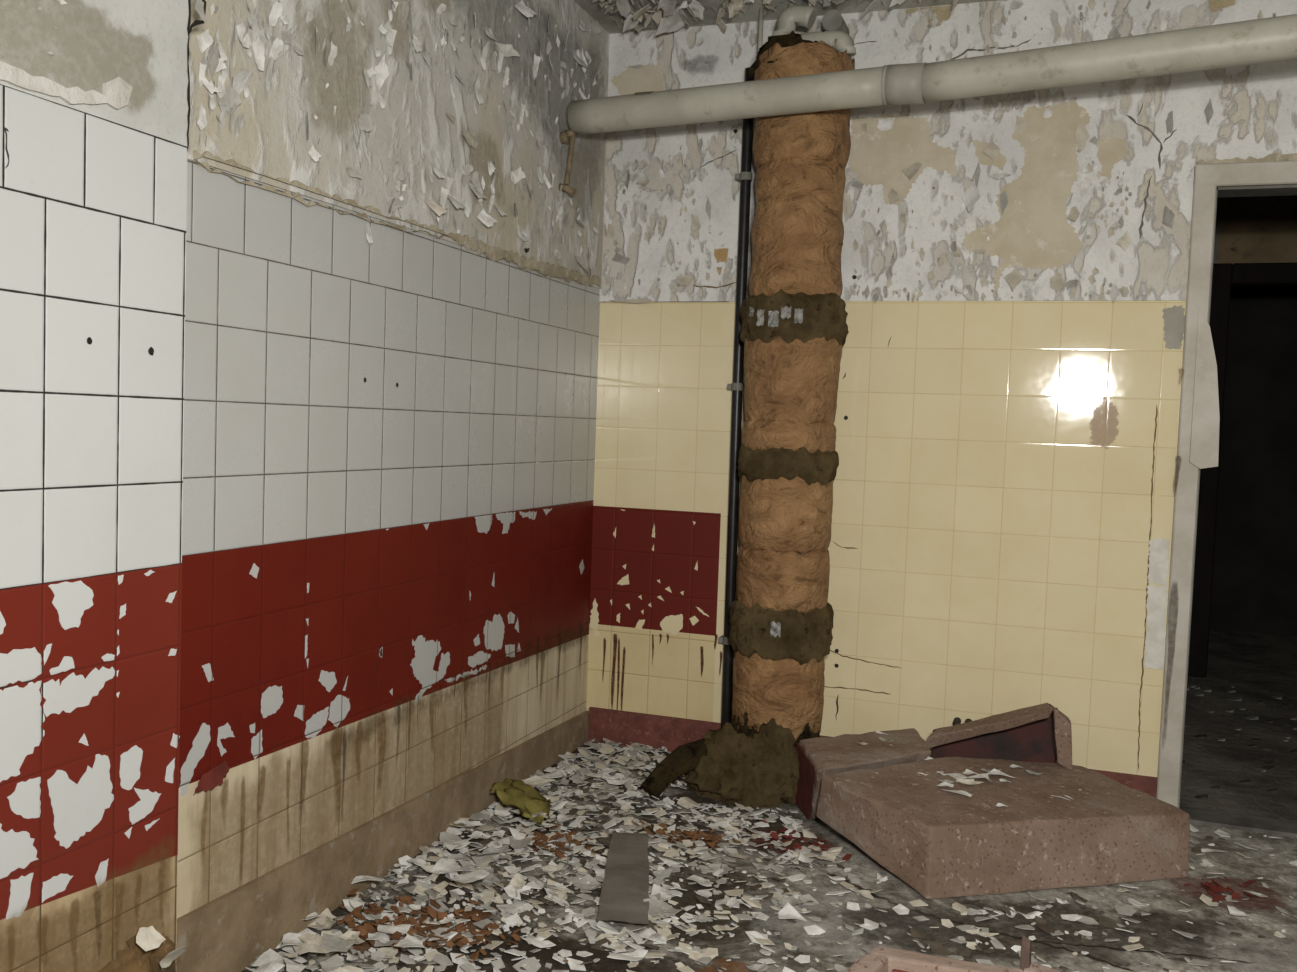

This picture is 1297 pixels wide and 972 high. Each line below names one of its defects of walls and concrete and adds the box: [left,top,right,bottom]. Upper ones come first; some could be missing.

spalling [0,61,133,109]
spalling [192,0,1027,304]
peeling [843,97,1152,303]
peeling [1162,305,1220,469]
peeling [48,580,94,630]
peeling [250,618,350,759]
peeling [410,611,521,702]
peeling [475,508,552,534]
peeling [590,564,709,637]
crack [1138,405,1158,770]
peeling [0,604,235,919]
spalling [98,926,185,972]